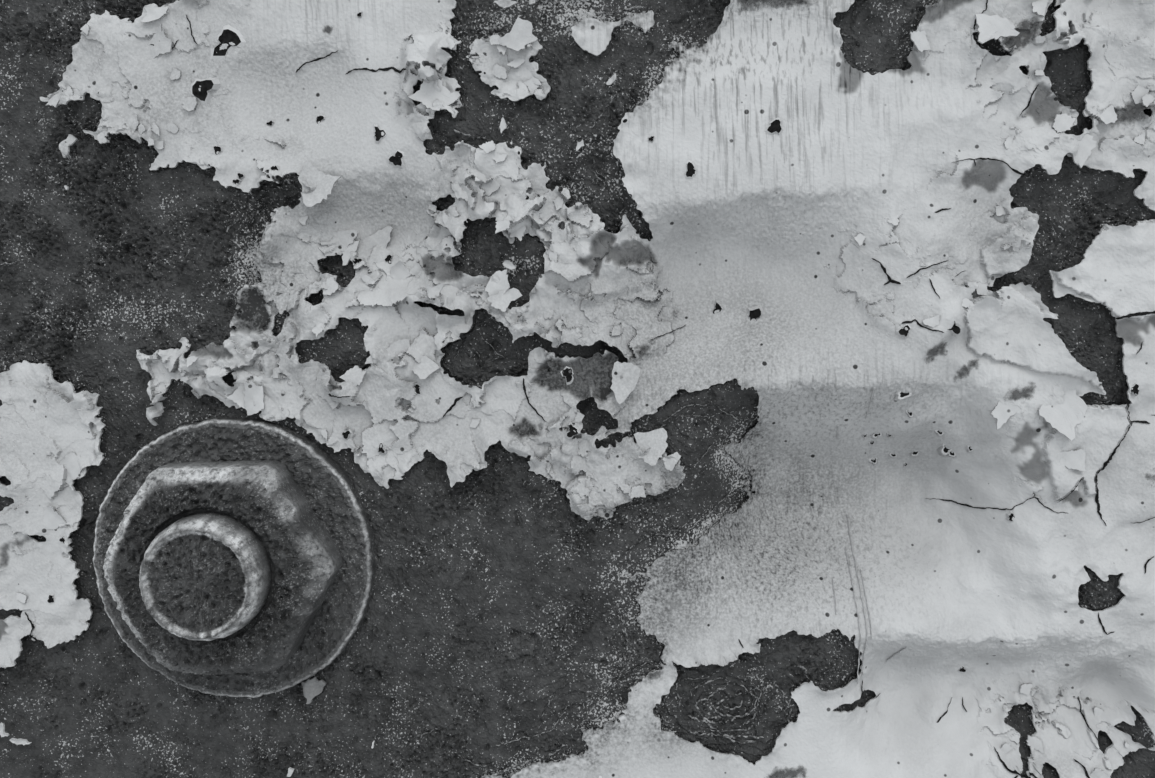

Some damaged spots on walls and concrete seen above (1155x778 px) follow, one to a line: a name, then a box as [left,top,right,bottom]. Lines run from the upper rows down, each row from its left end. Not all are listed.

peeling [0,0,862,778]
peeling [822,0,1155,522]
crack [926,381,1155,525]
crack [1116,311,1155,320]